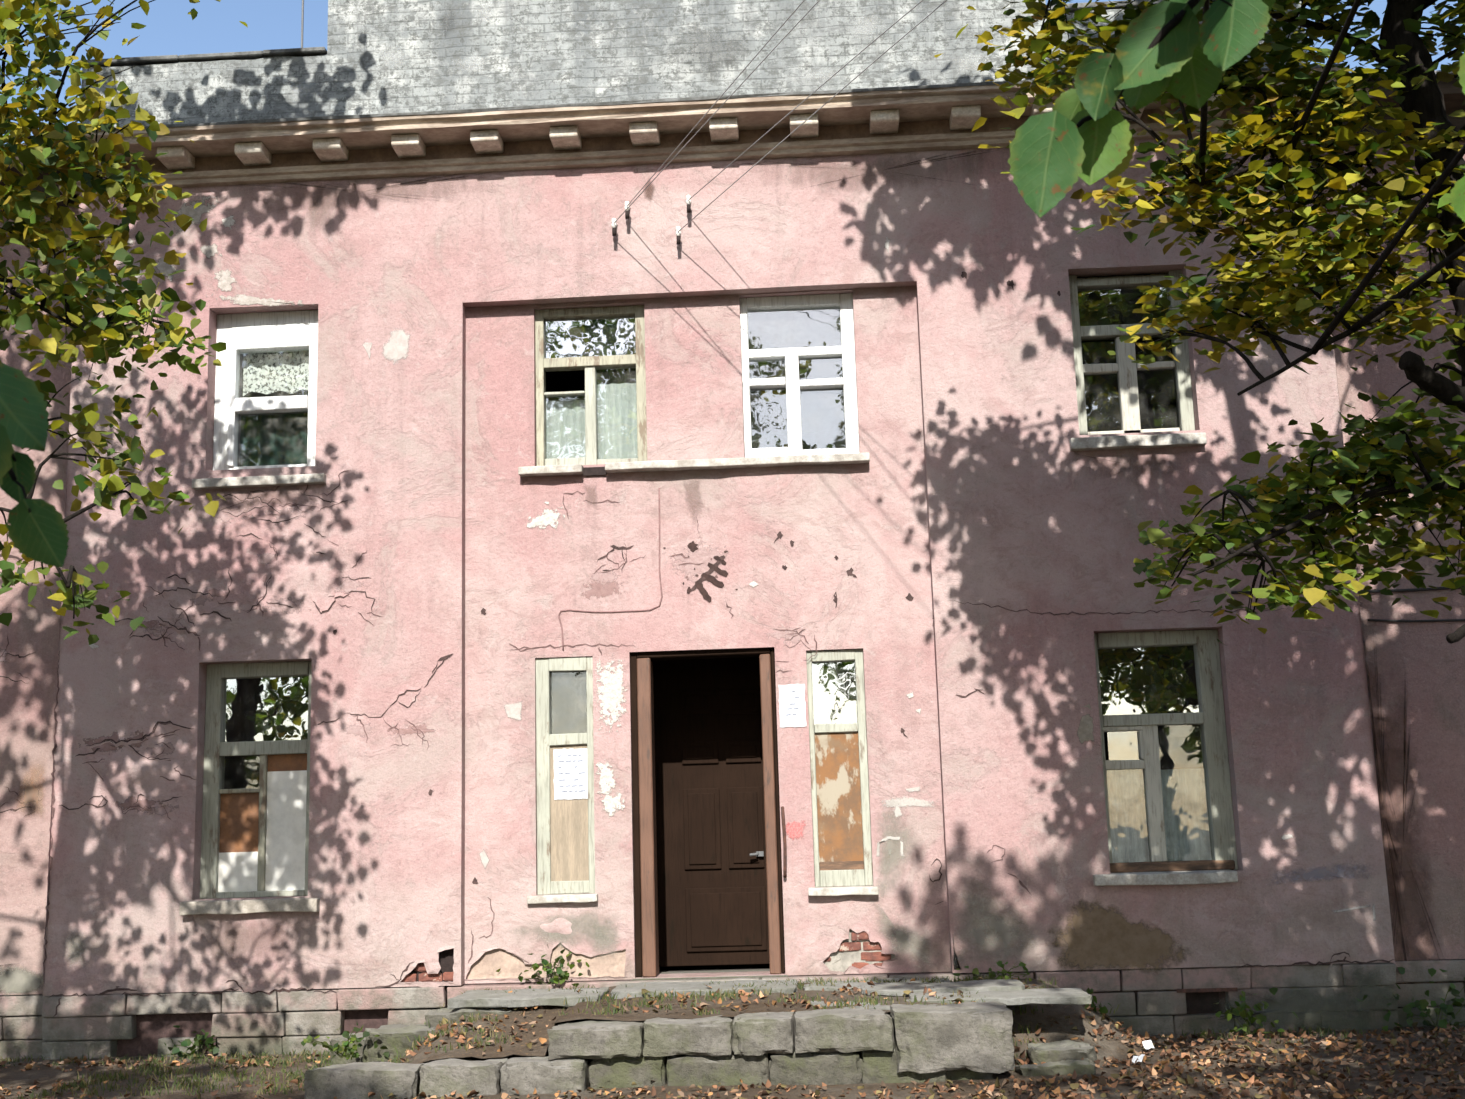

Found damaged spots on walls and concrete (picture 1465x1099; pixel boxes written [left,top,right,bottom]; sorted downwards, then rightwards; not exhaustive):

peeling [363,329,409,363]
peeling [527,502,565,529]
crack [106,470,382,651]
crack [582,543,645,599]
peeling [664,541,758,602]
crack [317,654,453,749]
peeling [595,659,628,736]
peeling [596,758,625,818]
crack [0,635,335,1017]
spalling [398,939,630,987]
spalling [819,923,899,975]